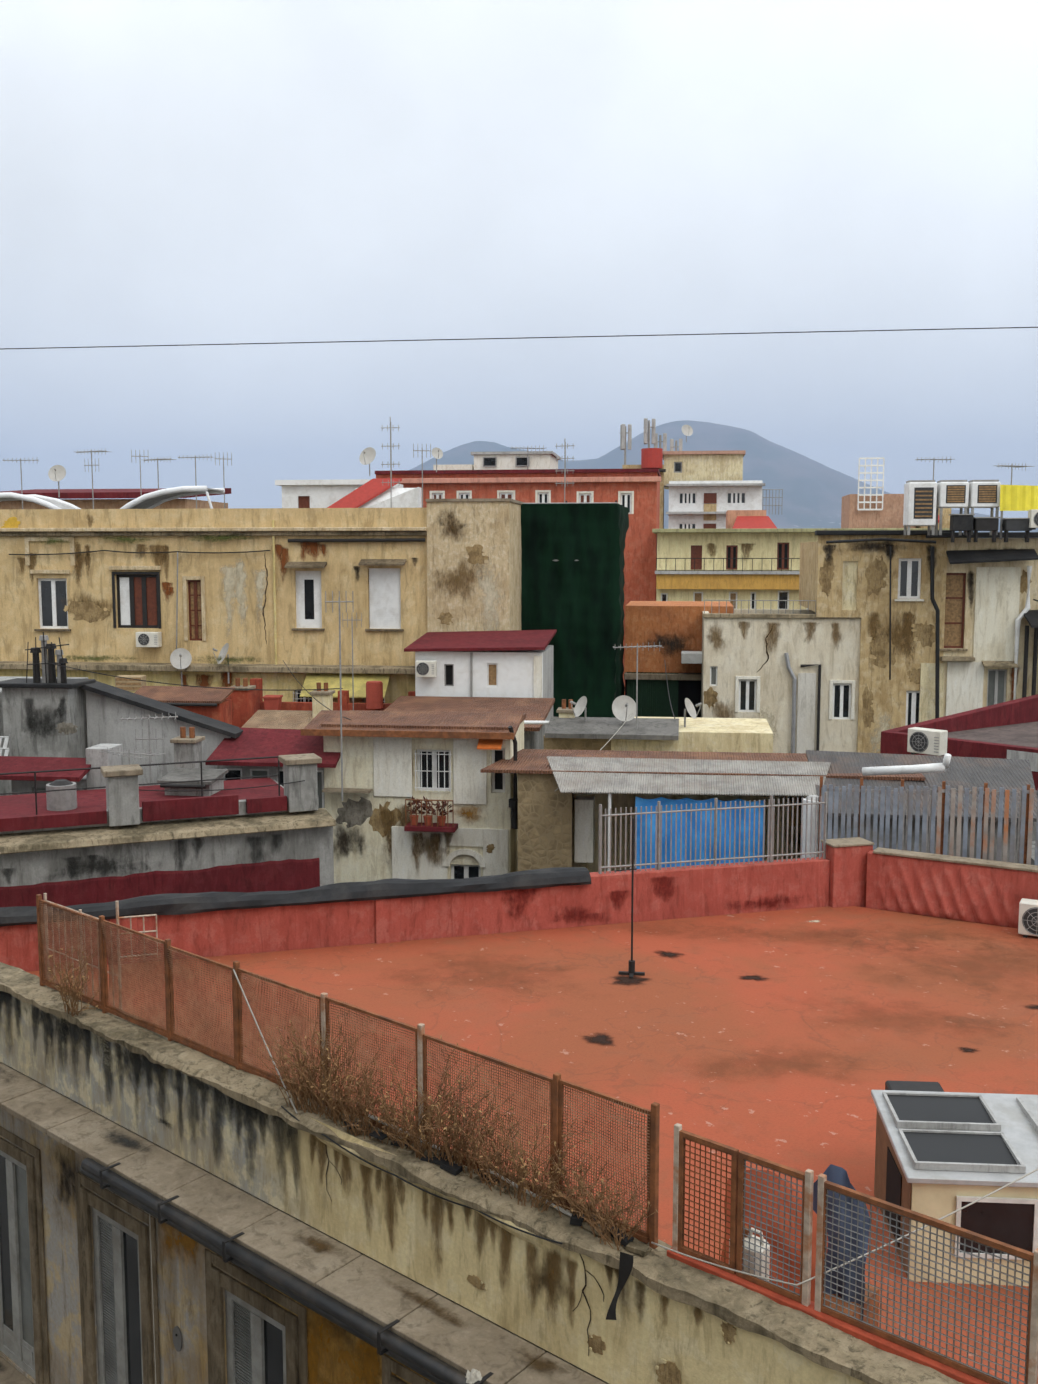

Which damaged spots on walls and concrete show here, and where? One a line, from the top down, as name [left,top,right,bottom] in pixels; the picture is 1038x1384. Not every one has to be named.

damp [440,514,463,538]
damp [438,563,474,595]
damp [869,612,915,654]
damp [26,698,65,736]
damp [614,975,648,985]
damp [585,1034,613,1045]
damp [0,982,404,1248]
damp [306,1236,330,1252]
damp [423,1189,576,1309]
crack [573,1254,604,1356]
spalling [655,1359,681,1384]